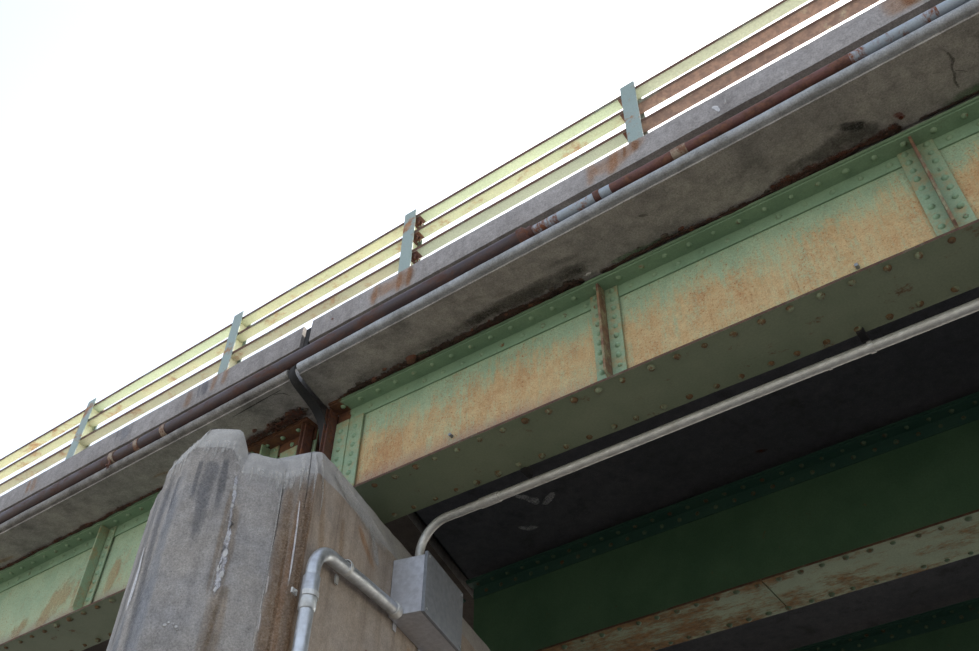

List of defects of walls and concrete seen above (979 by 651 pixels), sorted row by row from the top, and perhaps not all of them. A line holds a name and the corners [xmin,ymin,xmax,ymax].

crack [947,52,963,86]
damp [175,440,324,651]